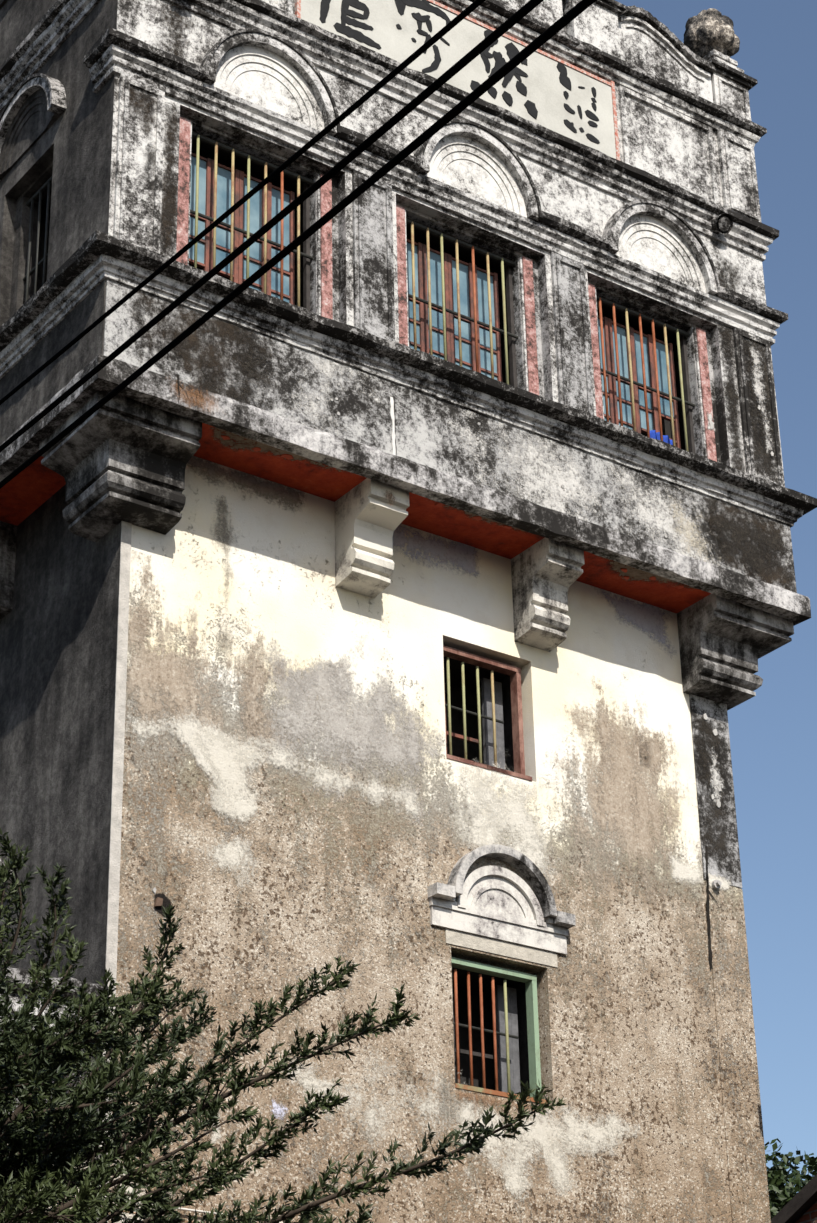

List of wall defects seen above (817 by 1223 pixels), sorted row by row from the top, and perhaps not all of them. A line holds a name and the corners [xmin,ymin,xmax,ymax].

damp [163,11,194,56]
damp [204,33,337,136]
damp [125,291,273,406]
damp [720,329,777,480]
damp [215,501,232,549]
damp [188,456,304,510]
damp [392,526,476,573]
damp [705,497,792,587]
damp [127,556,280,752]
damp [603,592,668,647]
damp [556,685,728,905]
damp [447,776,557,919]